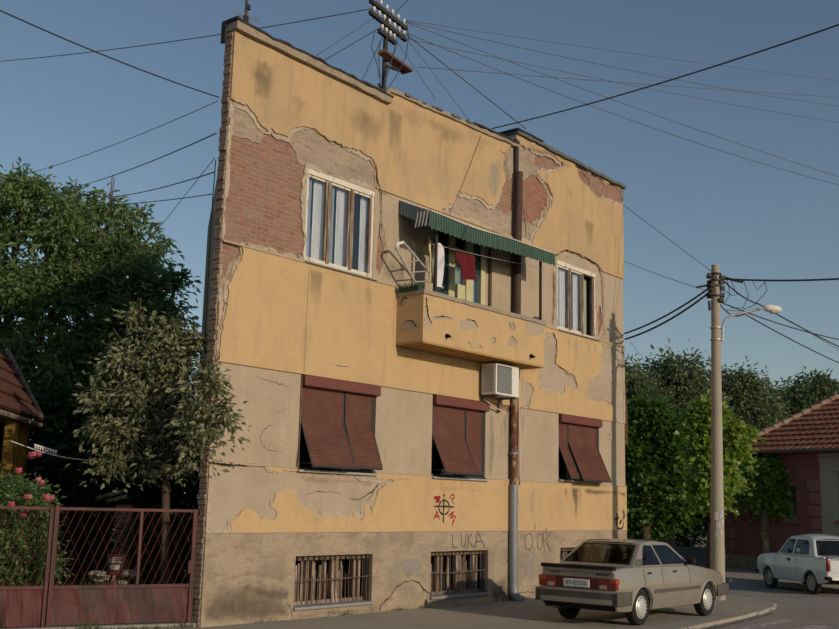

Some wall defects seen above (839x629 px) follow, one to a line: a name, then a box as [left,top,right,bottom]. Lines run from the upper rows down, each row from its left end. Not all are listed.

spalling [214,99,377,358]
spalling [441,145,565,244]
spalling [575,165,622,205]
spalling [400,297,478,331]
spalling [521,320,577,409]
spalling [557,250,625,424]
rust [507,399,518,484]
peeling [205,462,406,535]
crack [380,580,430,610]